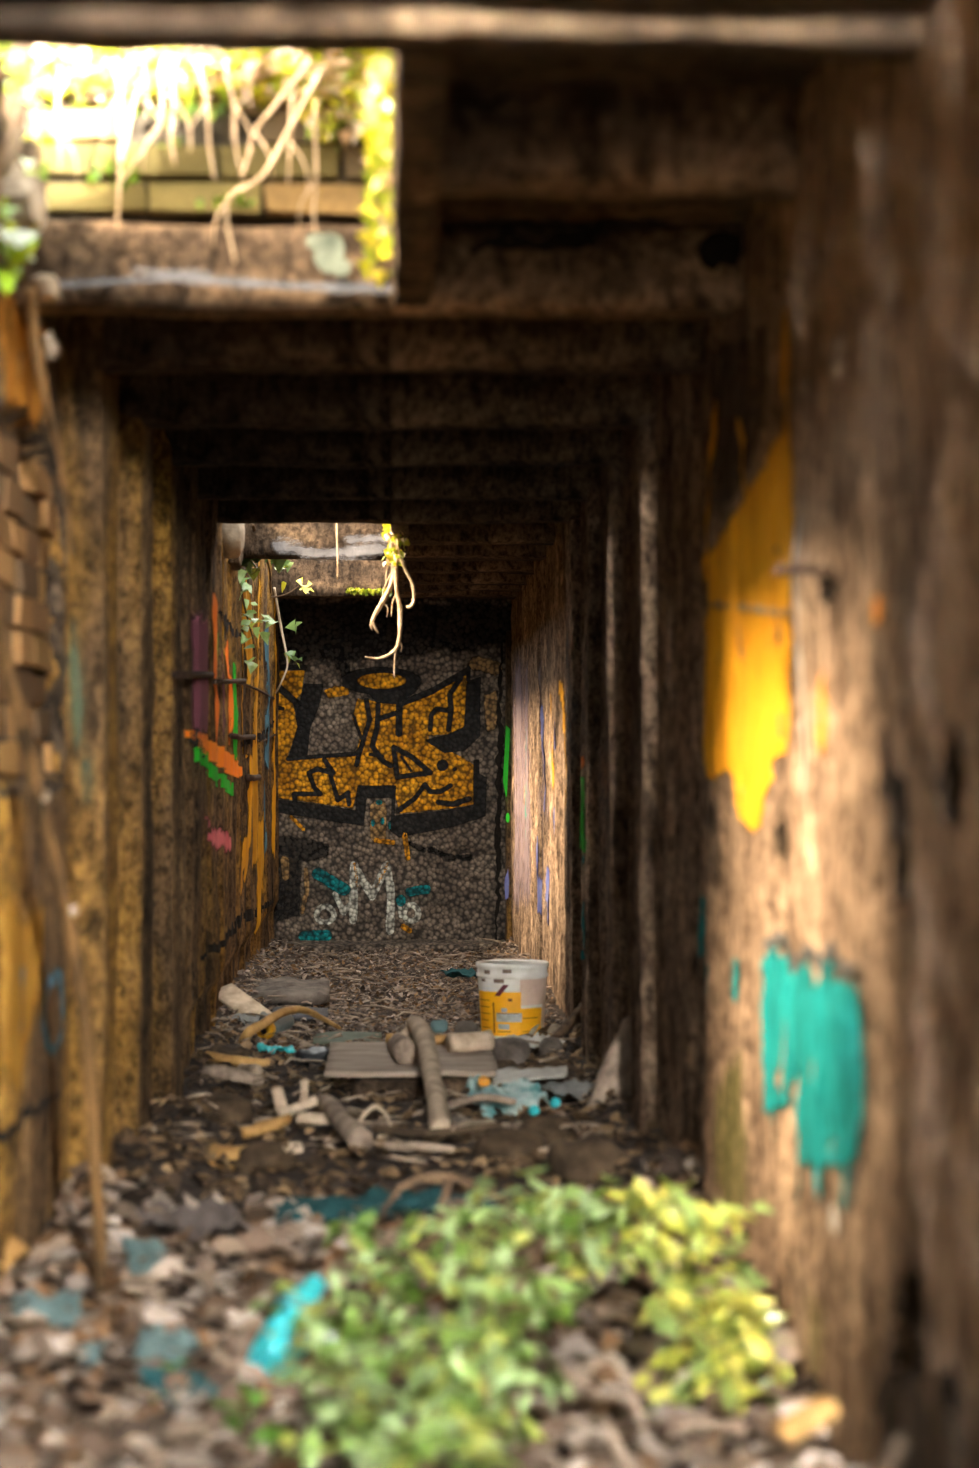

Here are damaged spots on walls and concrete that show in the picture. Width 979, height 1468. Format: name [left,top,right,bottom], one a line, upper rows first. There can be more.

peeling [775,1070,783,1089]